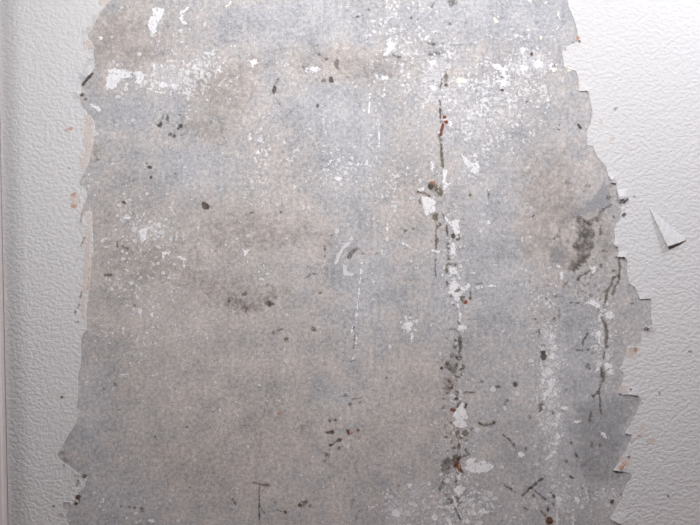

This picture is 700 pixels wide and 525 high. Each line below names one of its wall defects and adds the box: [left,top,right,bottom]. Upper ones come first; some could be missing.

peeling [649,208,687,247]
crack [417,107,510,519]
spalling [597,311,615,323]
spalling [591,327,605,344]
crack [576,262,621,421]
spalling [594,342,613,361]
spalling [604,361,615,378]
spalling [427,510,454,525]